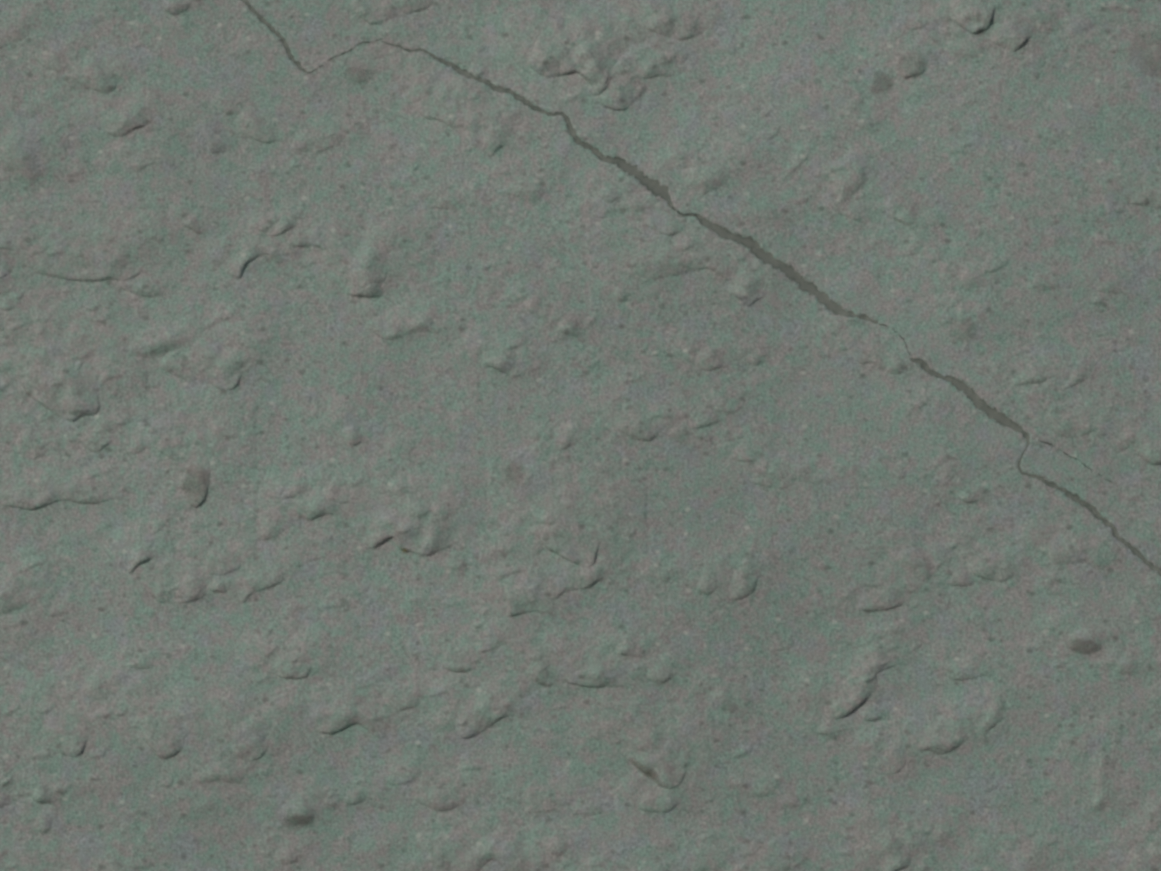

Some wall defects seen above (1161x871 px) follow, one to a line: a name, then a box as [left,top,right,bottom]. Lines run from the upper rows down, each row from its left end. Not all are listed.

crack [242,0,1161,576]